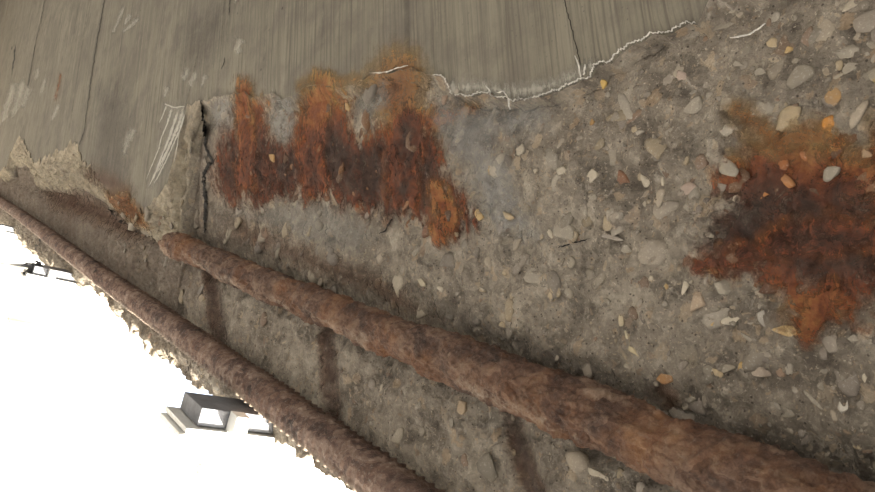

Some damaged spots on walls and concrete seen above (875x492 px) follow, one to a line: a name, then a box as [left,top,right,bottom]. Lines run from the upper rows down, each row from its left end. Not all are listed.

crack [564,0,581,65]
crack [200,100,217,233]
spalling [244,73,393,170]
rust [207,46,478,249]
spalling [760,160,797,213]
rust [683,100,875,348]
spalling [823,166,841,182]
spalling [0,208,240,399]
rust [204,272,223,342]
rust [320,327,340,419]
spalling [272,424,355,492]
rust [507,416,543,492]